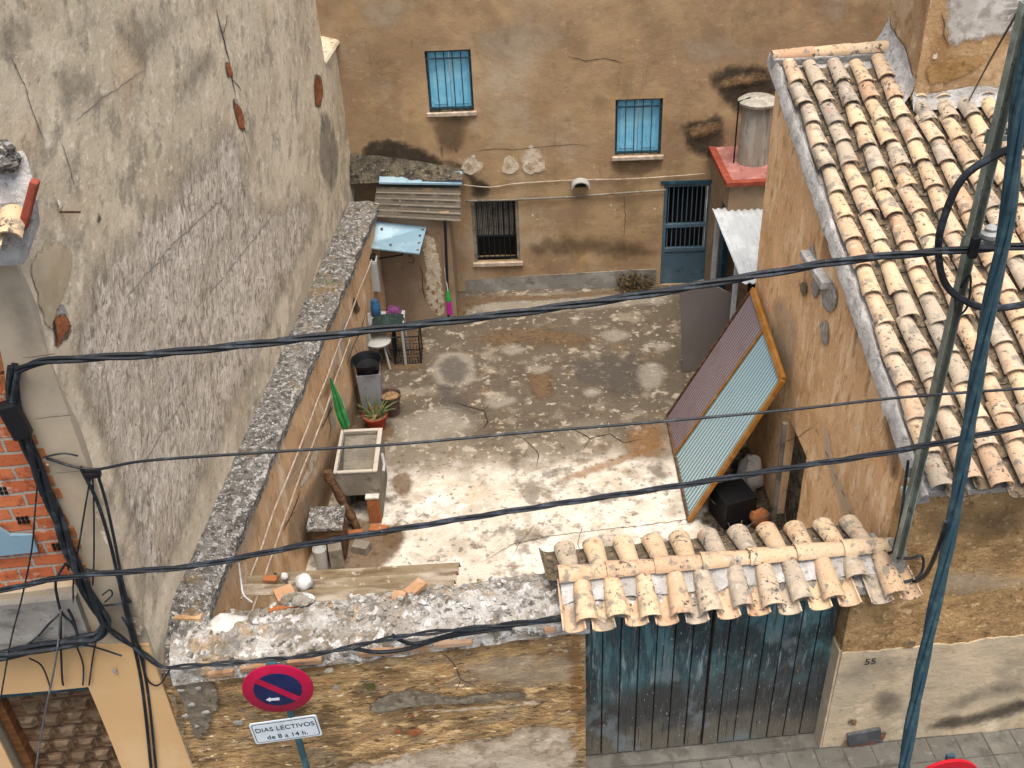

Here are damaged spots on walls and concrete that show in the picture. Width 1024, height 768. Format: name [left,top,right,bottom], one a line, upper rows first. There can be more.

crack [216,10,241,95]
peeling [926,0,1024,85]
flaking render [314,74,323,108]
crack [10,56,74,183]
flaking render [461,155,484,175]
flaking render [502,145,546,175]
flaking render [53,304,72,347]
crack [455,402,541,463]
crack [575,421,641,448]
flaking render [369,689,537,736]